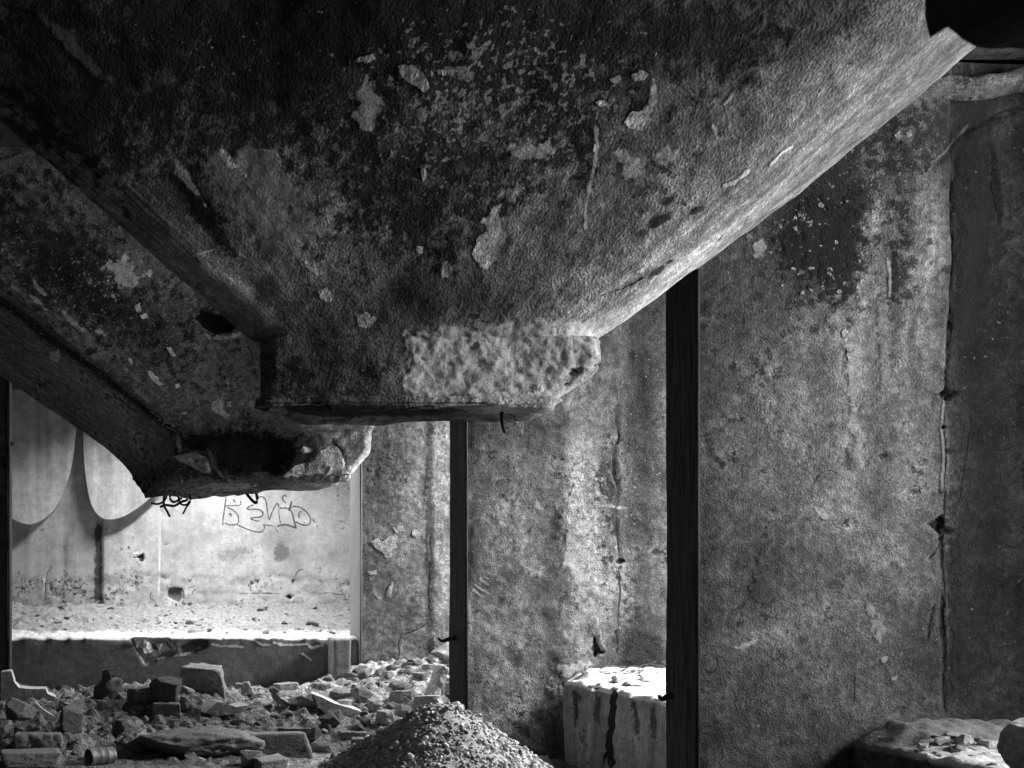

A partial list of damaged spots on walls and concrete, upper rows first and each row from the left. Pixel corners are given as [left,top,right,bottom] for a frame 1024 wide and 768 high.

peeling [357,54,376,64]
peeling [352,84,382,131]
peeling [399,64,447,92]
peeling [609,70,657,131]
spalling [472,189,506,269]
spalling [195,313,243,341]
leakage [746,183,871,472]
leakage [874,230,908,386]
flaking render [403,319,599,433]
crack [926,107,1022,712]
flaking render [284,438,350,478]
crack [611,402,625,652]